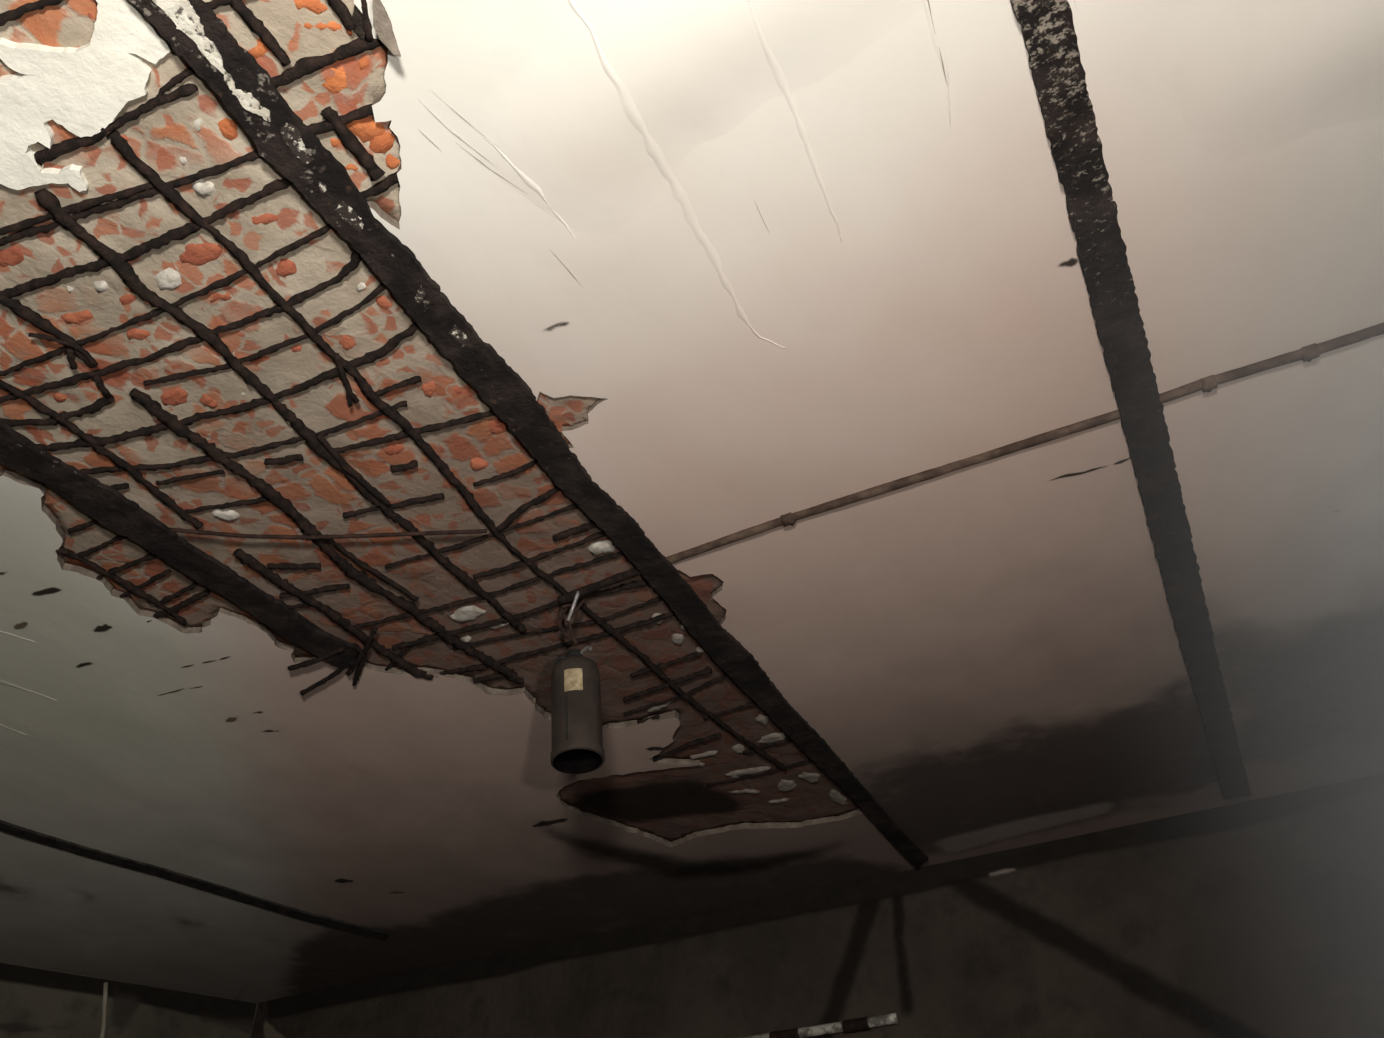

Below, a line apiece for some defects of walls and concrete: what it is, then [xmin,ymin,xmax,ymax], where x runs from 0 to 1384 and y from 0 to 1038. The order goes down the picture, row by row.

crack [418,93,518,188]
spalling [0,0,860,842]
water stain [937,804,1111,854]